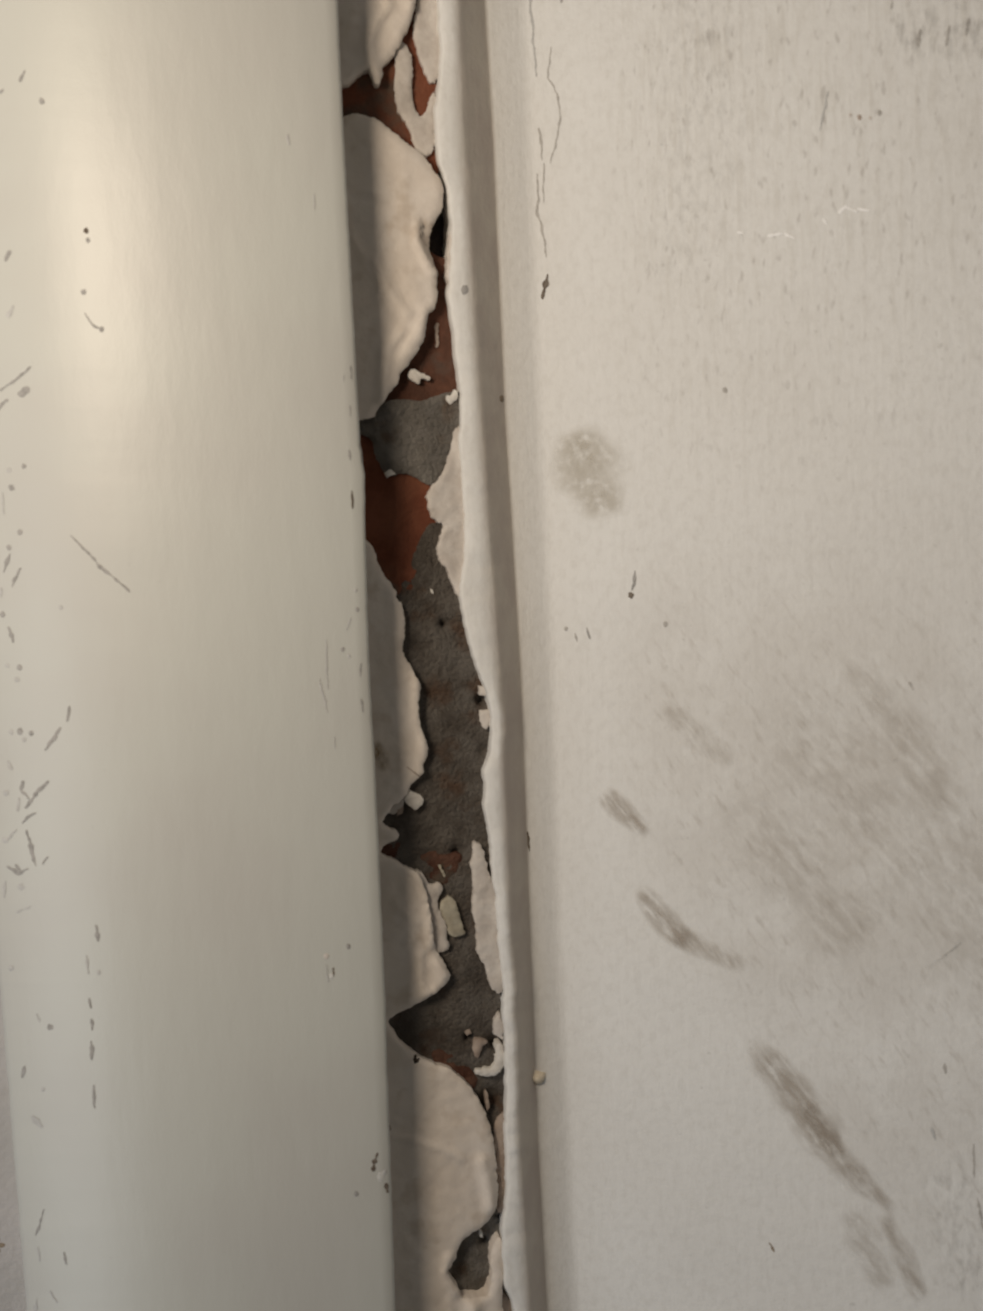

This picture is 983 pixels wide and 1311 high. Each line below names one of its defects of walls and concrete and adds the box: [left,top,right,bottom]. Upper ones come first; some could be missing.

spalling [338,0,512,1311]